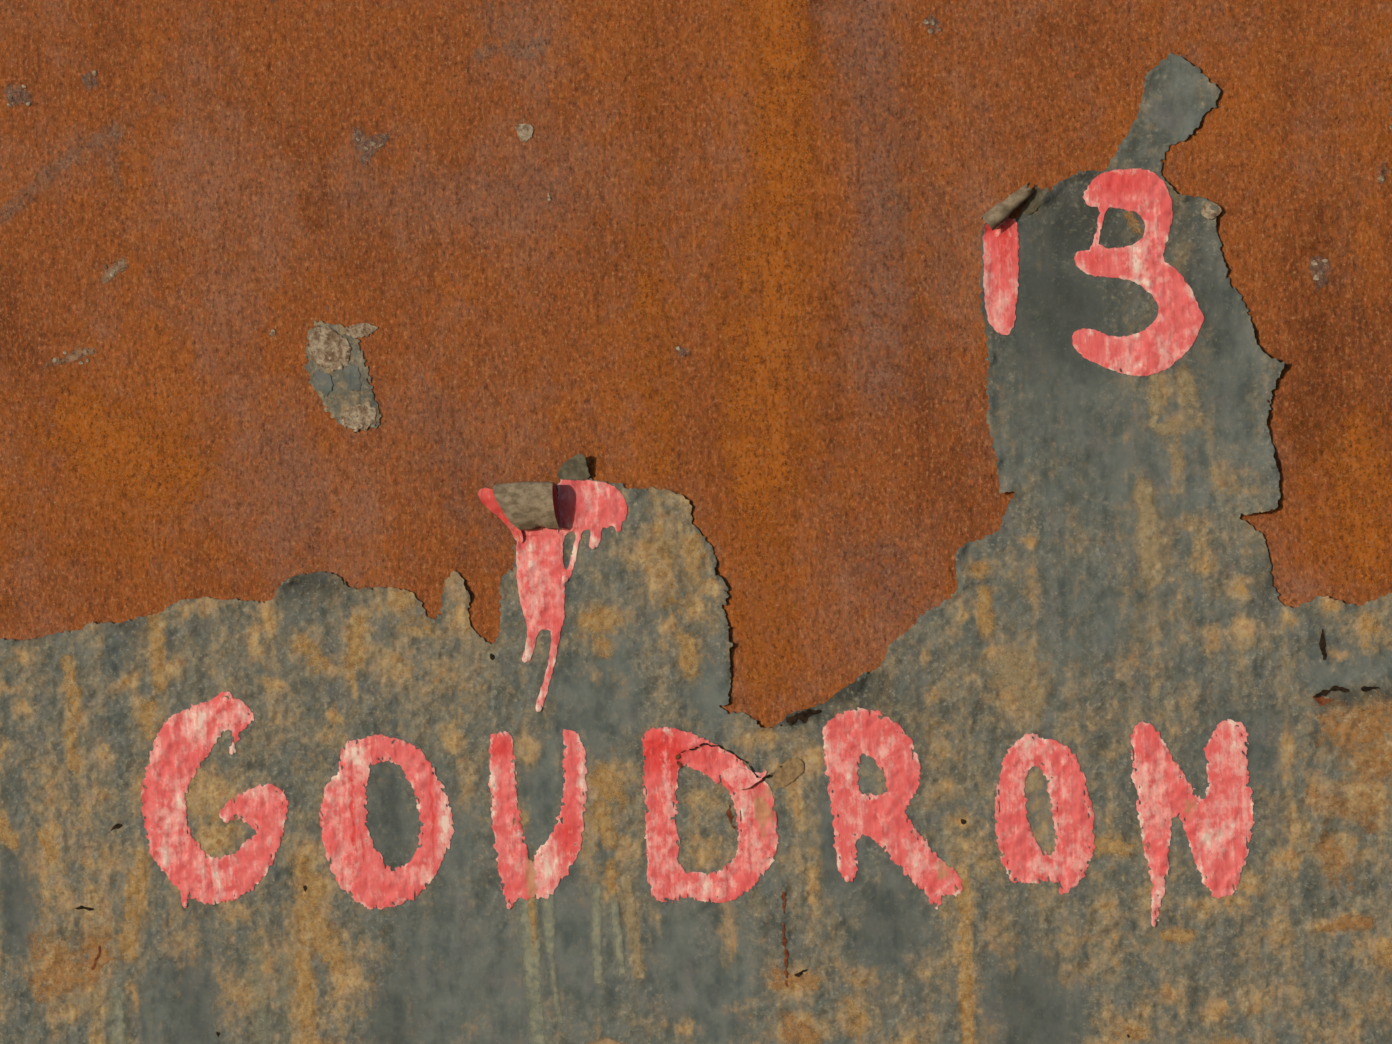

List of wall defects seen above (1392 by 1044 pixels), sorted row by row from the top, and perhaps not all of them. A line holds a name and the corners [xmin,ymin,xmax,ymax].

peeling [980,182,1034,230]
rust [1148,365,1203,472]
peeling [493,482,561,536]
rust [1134,479,1164,589]
rust [971,562,994,636]
rust [61,655,81,772]
spalling [786,709,822,726]
peeling [364,757,424,871]
peeling [671,764,743,876]
peeling [772,758,805,788]
peeling [857,750,888,800]
peeling [1024,762,1059,856]